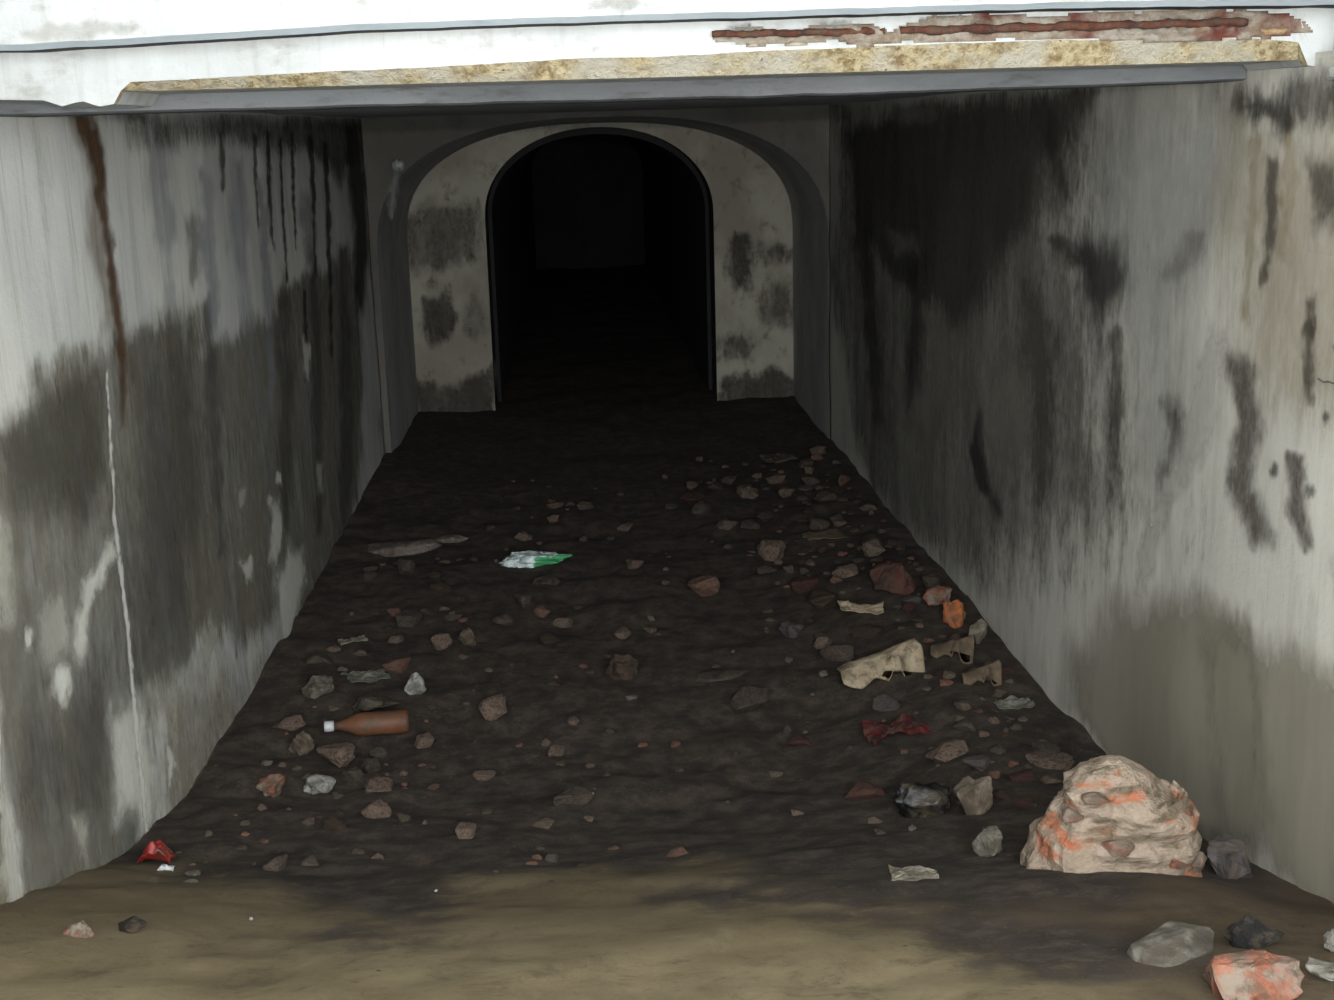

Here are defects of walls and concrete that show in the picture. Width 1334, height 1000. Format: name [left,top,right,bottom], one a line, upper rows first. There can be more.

water stain [1234,78,1334,129]
corrosion [76,116,126,414]
water stain [1260,159,1278,282]
water stain [1313,166,1334,220]
water stain [1303,302,1316,402]
water stain [1163,337,1266,543]
water stain [0,114,368,905]
water stain [1271,452,1313,552]
water stain [1076,603,1334,903]